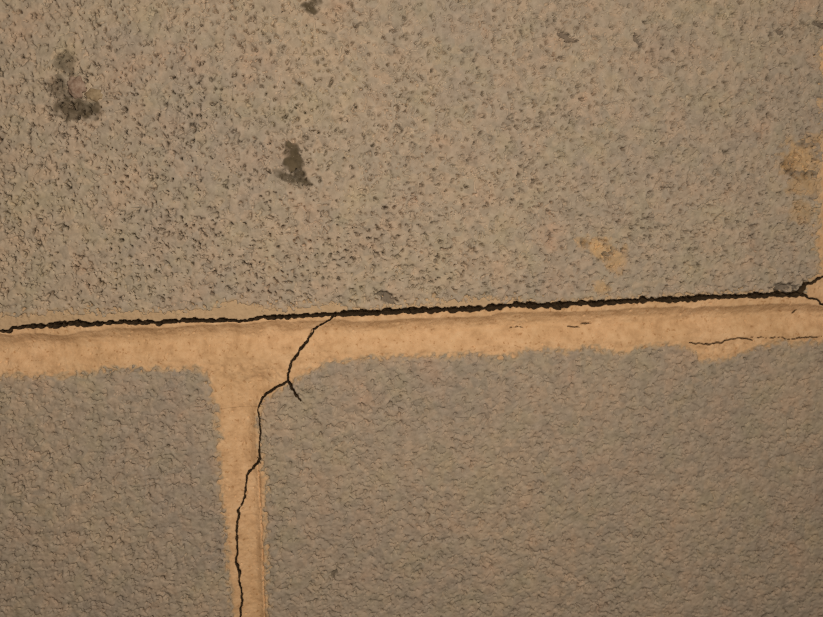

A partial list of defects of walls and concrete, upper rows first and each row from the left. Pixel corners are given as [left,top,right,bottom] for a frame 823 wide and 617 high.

crack [0,276,823,617]